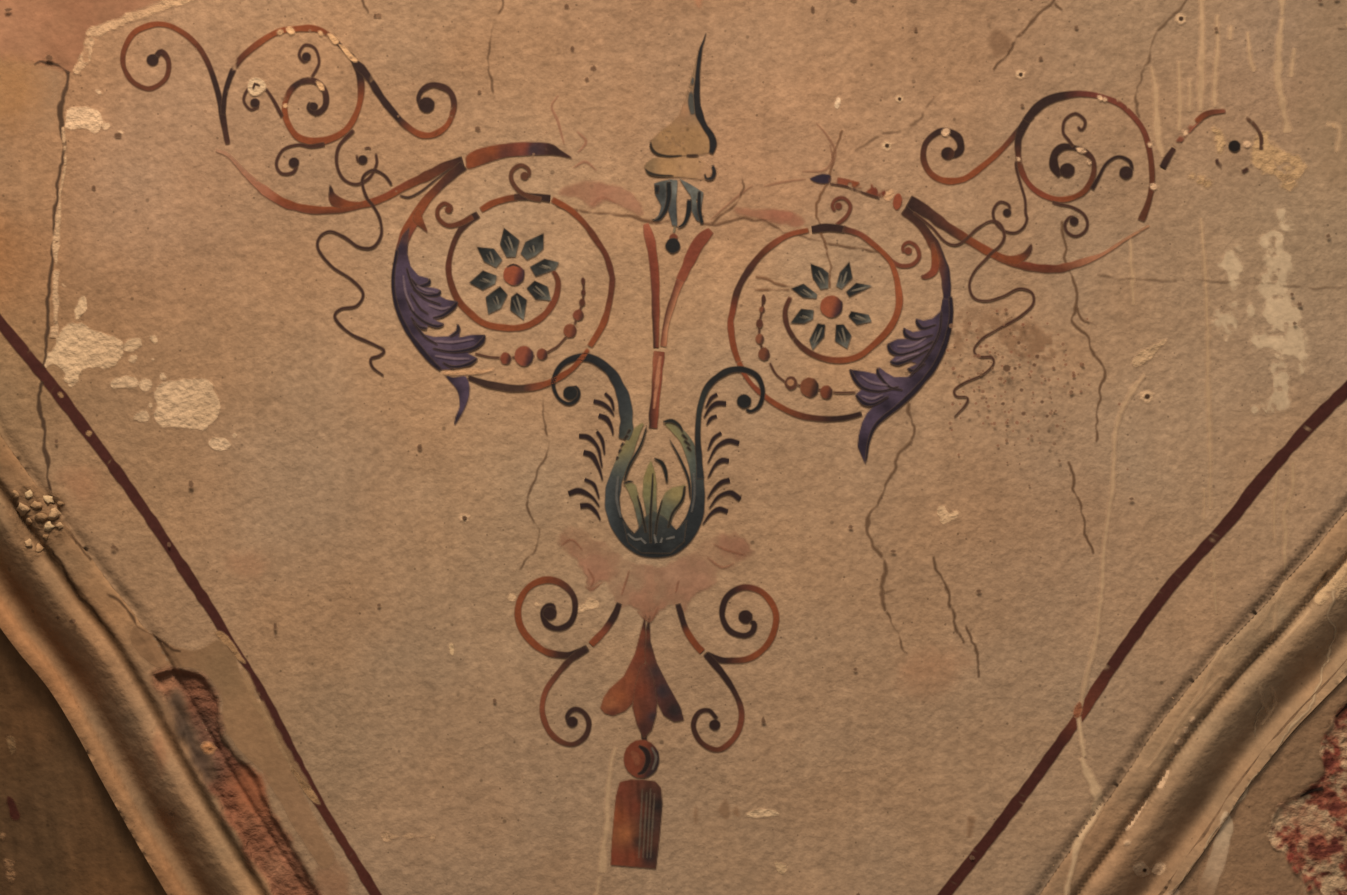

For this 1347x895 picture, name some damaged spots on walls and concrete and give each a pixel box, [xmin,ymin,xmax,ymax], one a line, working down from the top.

crack [994,0,1061,69]
crack [37,60,69,493]
crack [558,206,661,223]
crack [756,276,788,290]
crack [704,131,878,287]
flaking render [44,296,237,451]
crack [866,403,915,647]
crack [933,557,979,676]
spalling [1268,704,1347,895]